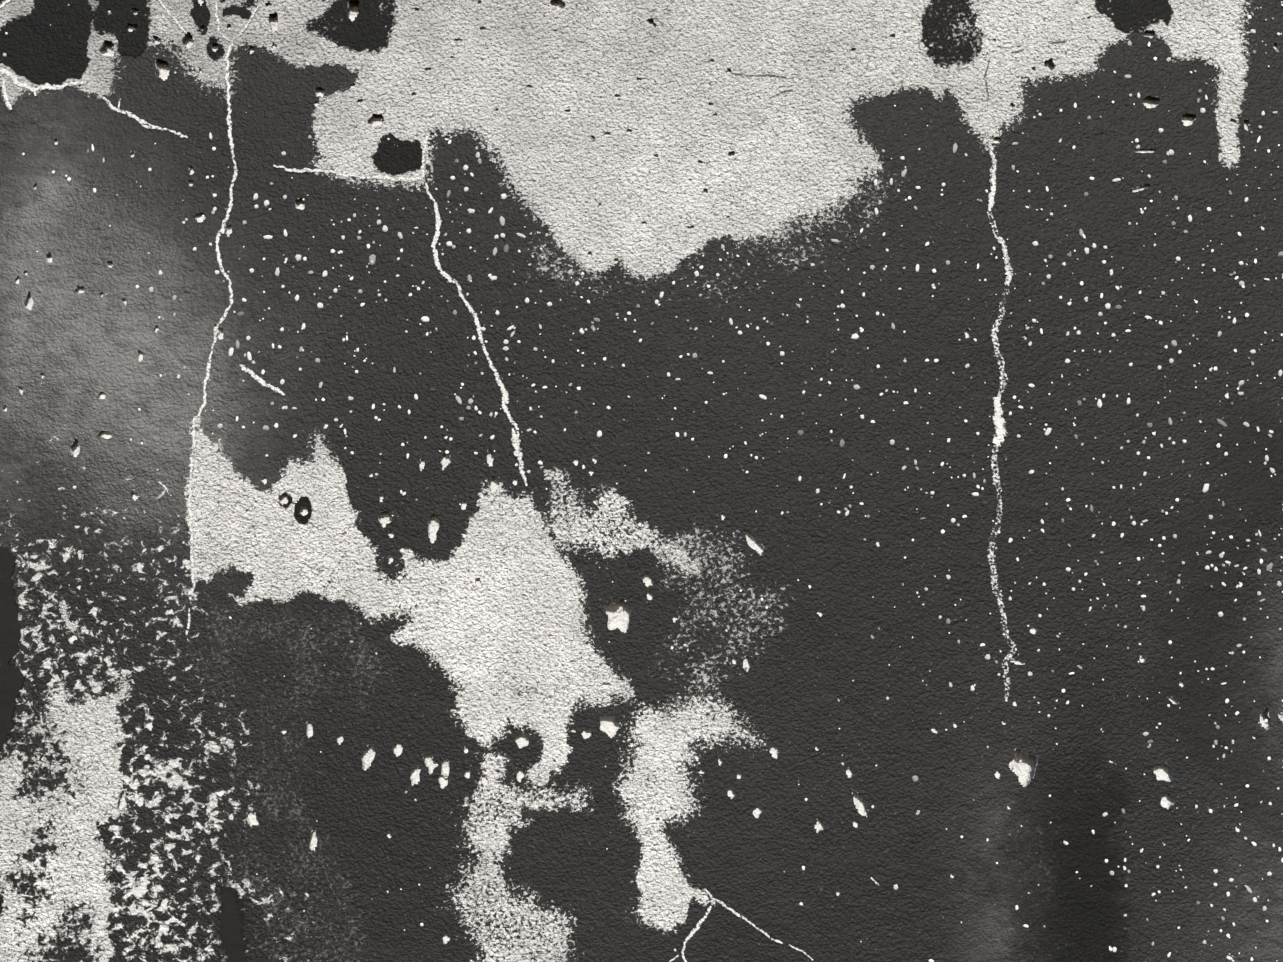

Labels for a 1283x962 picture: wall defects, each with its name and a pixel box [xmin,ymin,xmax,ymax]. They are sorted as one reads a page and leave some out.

leakage [0,0,152,86]
leakage [190,0,258,61]
leakage [305,0,399,53]
leakage [918,0,988,70]
leakage [1095,0,1174,33]
crack [0,69,187,138]
crack [158,0,285,635]
crack [273,136,527,486]
crack [987,141,1017,701]
crack [669,889,813,962]